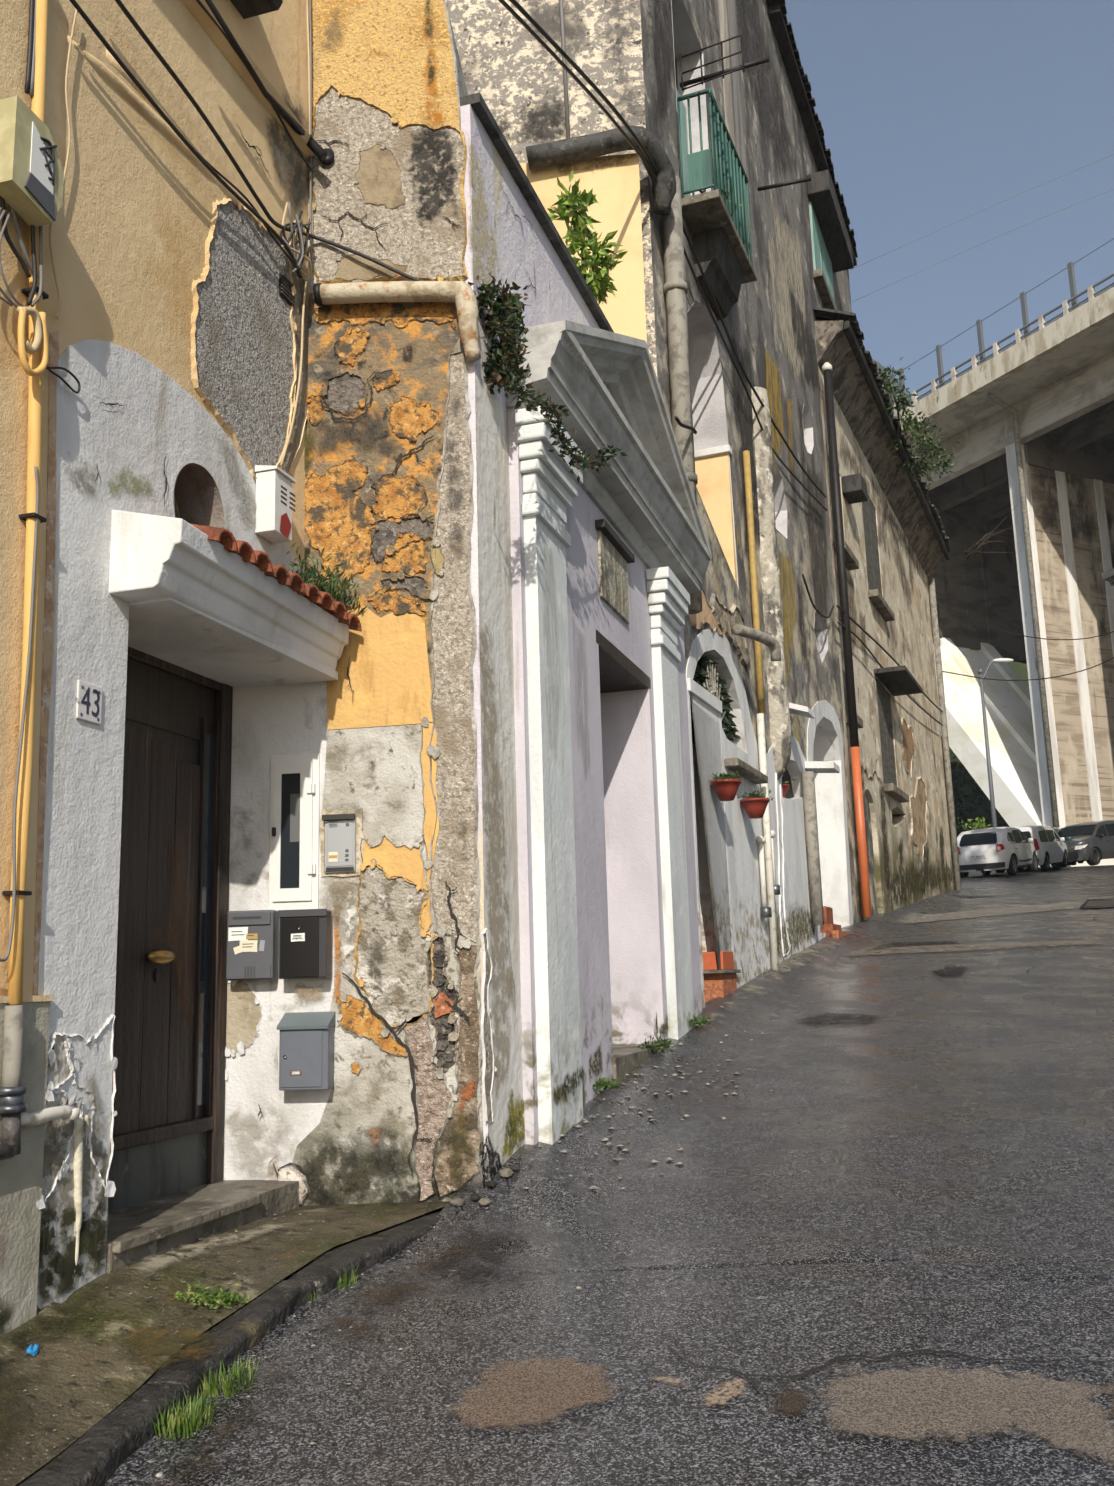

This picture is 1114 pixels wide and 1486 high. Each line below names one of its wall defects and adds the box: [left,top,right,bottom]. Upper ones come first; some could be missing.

damp [609,0,628,56]
damp [499,103,565,140]
damp [410,128,497,292]
spalling [190,85,497,1202]
damp [880,787,904,894]
damp [924,835,946,882]
spalling [36,1014,118,1209]
crack [342,973,435,1178]